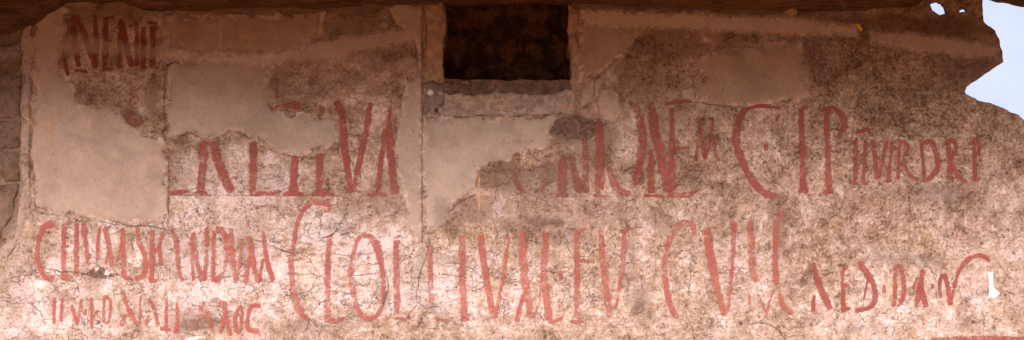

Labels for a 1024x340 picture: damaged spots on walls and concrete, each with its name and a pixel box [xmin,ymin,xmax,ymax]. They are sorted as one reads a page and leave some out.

spalling [123,110,144,126]
spalling [549,115,604,140]
crack [93,62,294,229]